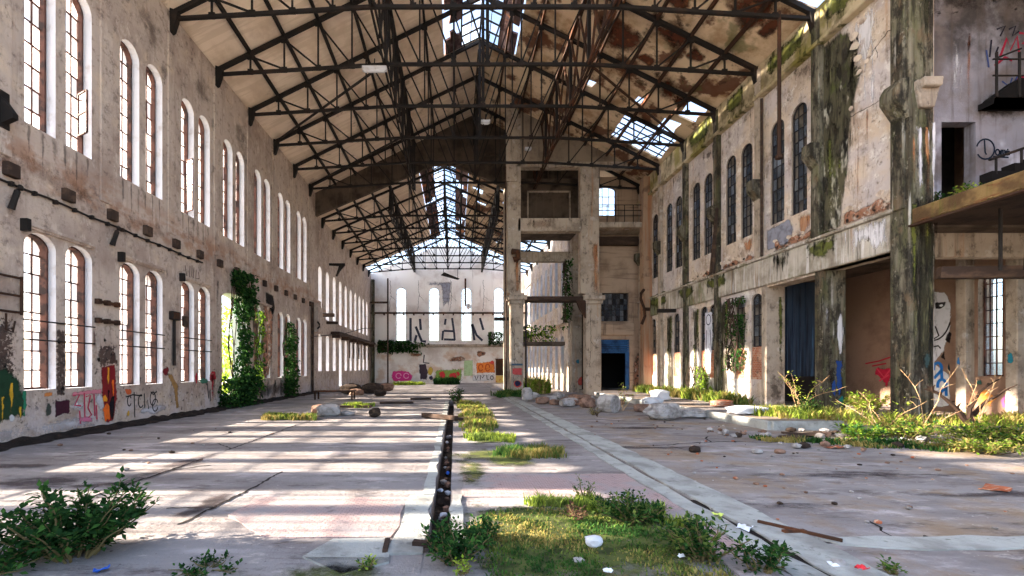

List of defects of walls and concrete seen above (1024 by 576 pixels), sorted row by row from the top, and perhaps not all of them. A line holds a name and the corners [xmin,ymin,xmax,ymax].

leakage [827,44,857,206]
leakage [916,122,936,185]
flaking render [842,189,890,224]
flaking render [773,229,811,251]
leakage [807,218,886,256]
crack [166,471,283,525]